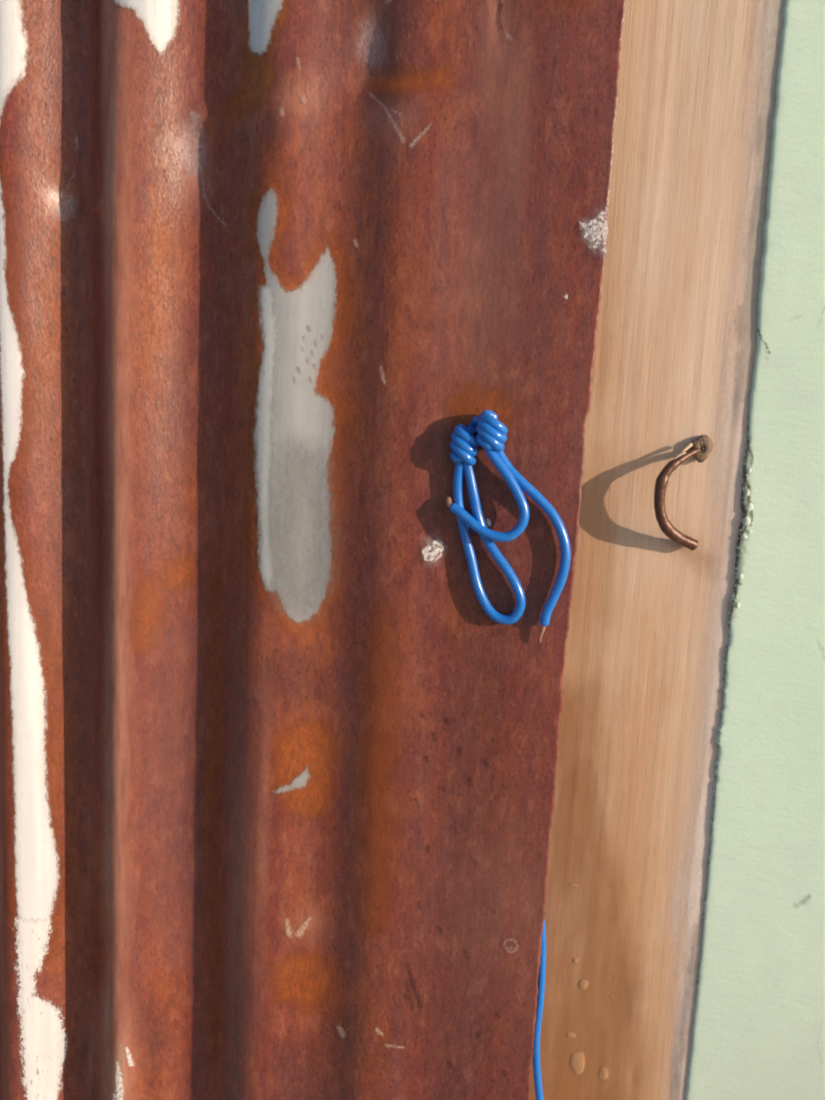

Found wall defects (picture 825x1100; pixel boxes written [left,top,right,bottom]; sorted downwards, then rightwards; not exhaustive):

peeling [0,0,28,121]
peeling [112,0,180,55]
peeling [248,0,283,56]
corrosion [245,0,287,57]
peeling [253,187,337,624]
corrosion [247,173,350,633]
corrosion [455,386,512,437]
peeling [0,182,68,1100]
corrosion [32,620,61,865]
corrosion [276,723,335,818]